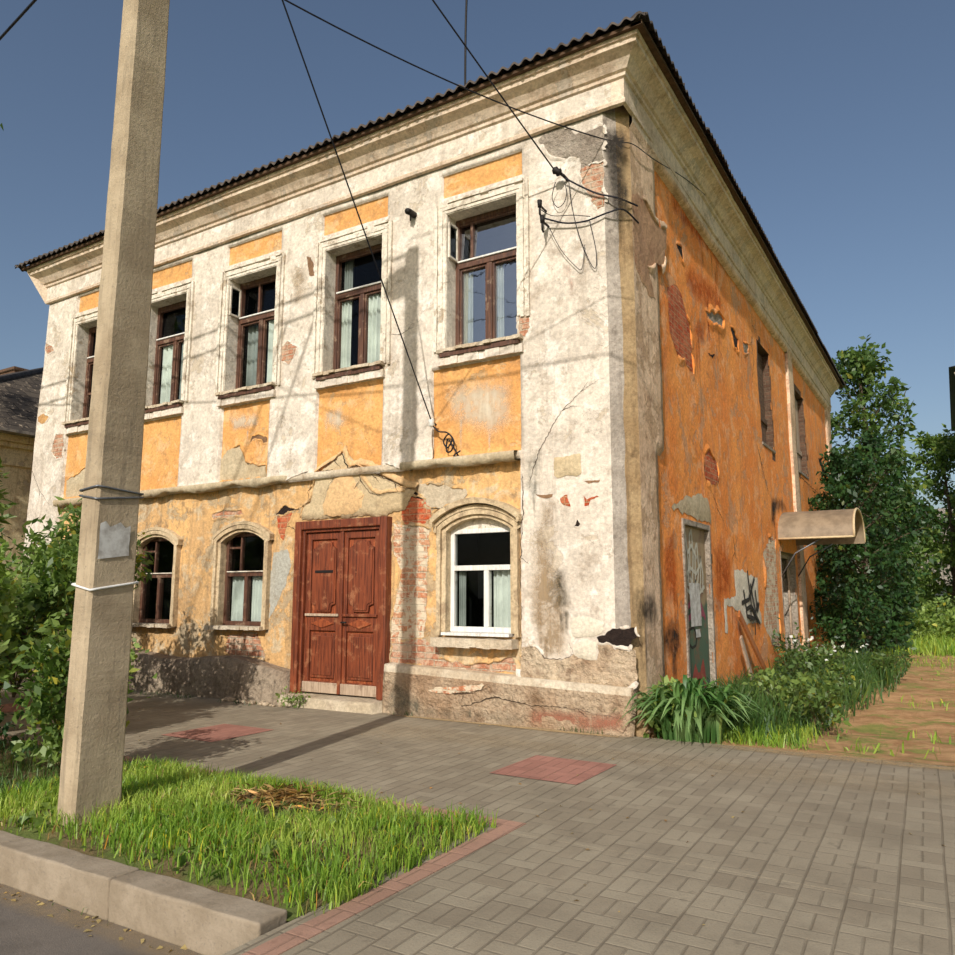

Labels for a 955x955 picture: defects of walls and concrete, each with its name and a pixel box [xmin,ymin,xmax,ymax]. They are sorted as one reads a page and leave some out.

flaking render [538,124,608,211]
water stain [607,130,627,208]
flaking render [632,193,685,300]
flaking render [281,339,299,366]
flaking render [667,284,695,381]
flaking render [64,466,85,498]
flaking render [219,432,268,482]
flaking render [702,444,720,493]
flaking render [269,453,640,690]
flaking render [428,683,484,694]